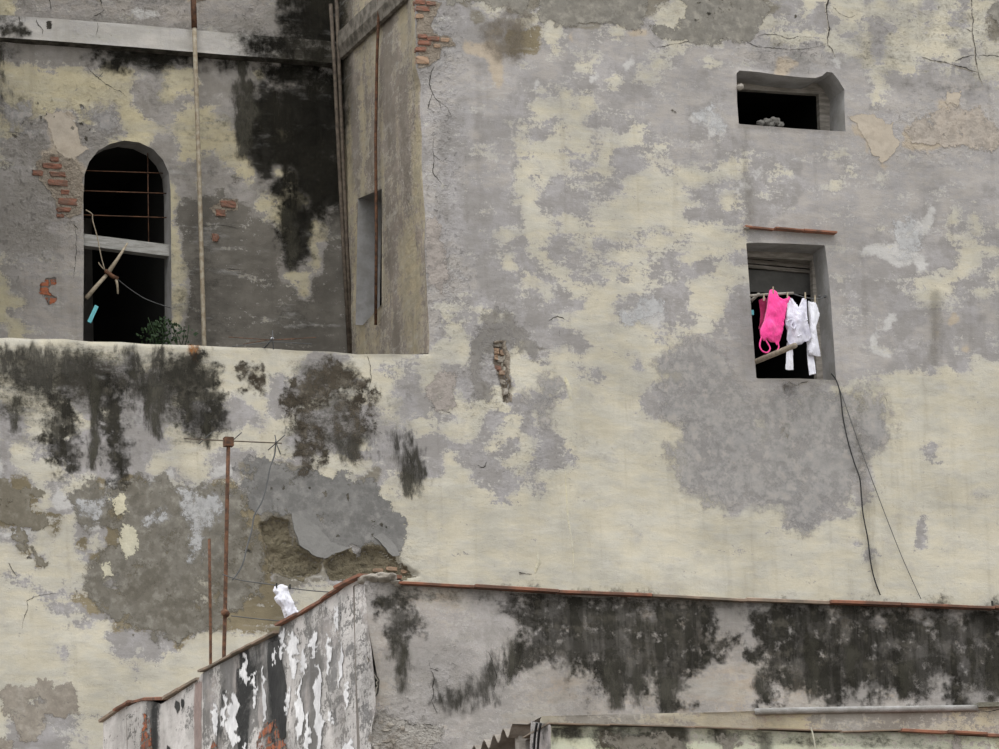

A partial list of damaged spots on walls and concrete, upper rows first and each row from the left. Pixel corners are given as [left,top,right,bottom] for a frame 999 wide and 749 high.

peeling [412,0,771,68]
crack [722,0,855,58]
crack [923,0,999,86]
flaking render [5,100,89,218]
water stain [182,0,341,270]
water stain [0,342,270,491]
water stain [279,354,381,476]
peeling [470,309,566,429]
peeling [66,454,416,647]
peeling [210,605,349,749]
water stain [371,591,423,692]
water stain [434,584,999,713]